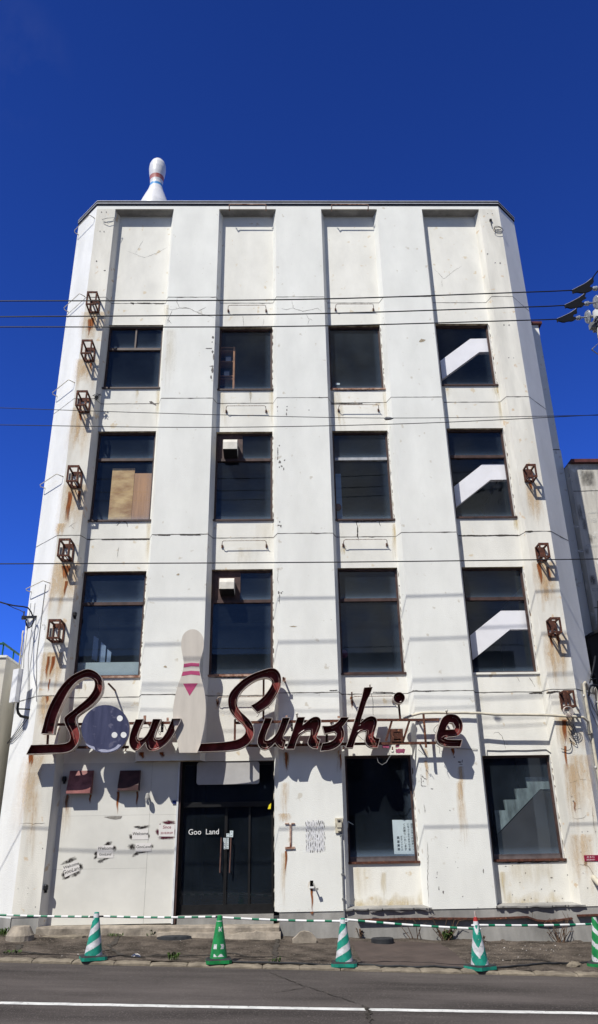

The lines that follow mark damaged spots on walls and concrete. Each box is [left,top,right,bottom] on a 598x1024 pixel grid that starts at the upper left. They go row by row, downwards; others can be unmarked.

rust [56,485,84,533]
rust [50,562,77,602]
rust [537,561,553,595]
rust [41,653,62,718]